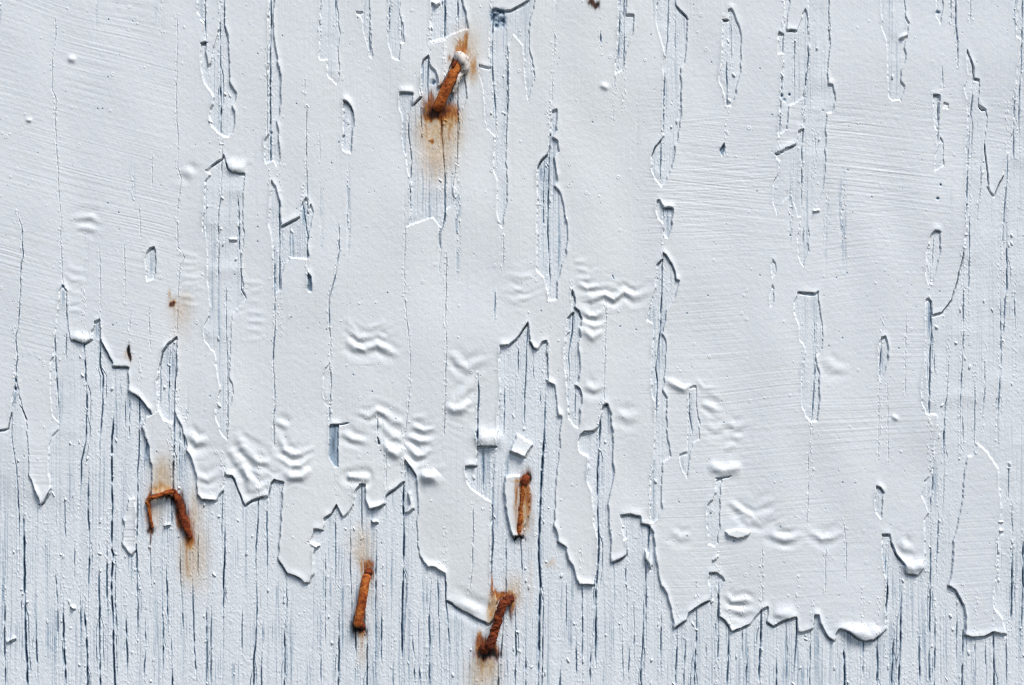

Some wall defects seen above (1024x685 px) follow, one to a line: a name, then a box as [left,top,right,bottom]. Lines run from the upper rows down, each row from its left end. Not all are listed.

corrosion [449,33,476,75]
corrosion [422,84,459,168]
crack [1,0,321,685]
peeling [563,290,584,430]
peeling [646,252,681,525]
crack [320,0,1024,685]
peeling [122,498,137,556]
corrosion [146,467,197,575]
peeling [504,475,521,537]
corrosion [513,471,532,541]
peeling [948,444,1006,685]
corrosion [476,632,500,678]